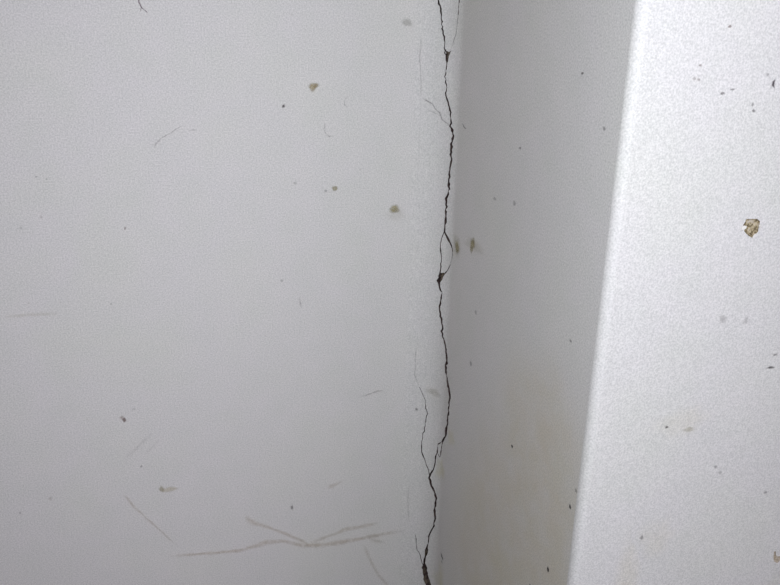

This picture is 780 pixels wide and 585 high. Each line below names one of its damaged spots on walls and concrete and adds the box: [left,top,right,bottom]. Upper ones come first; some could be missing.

crack [415,0,460,585]